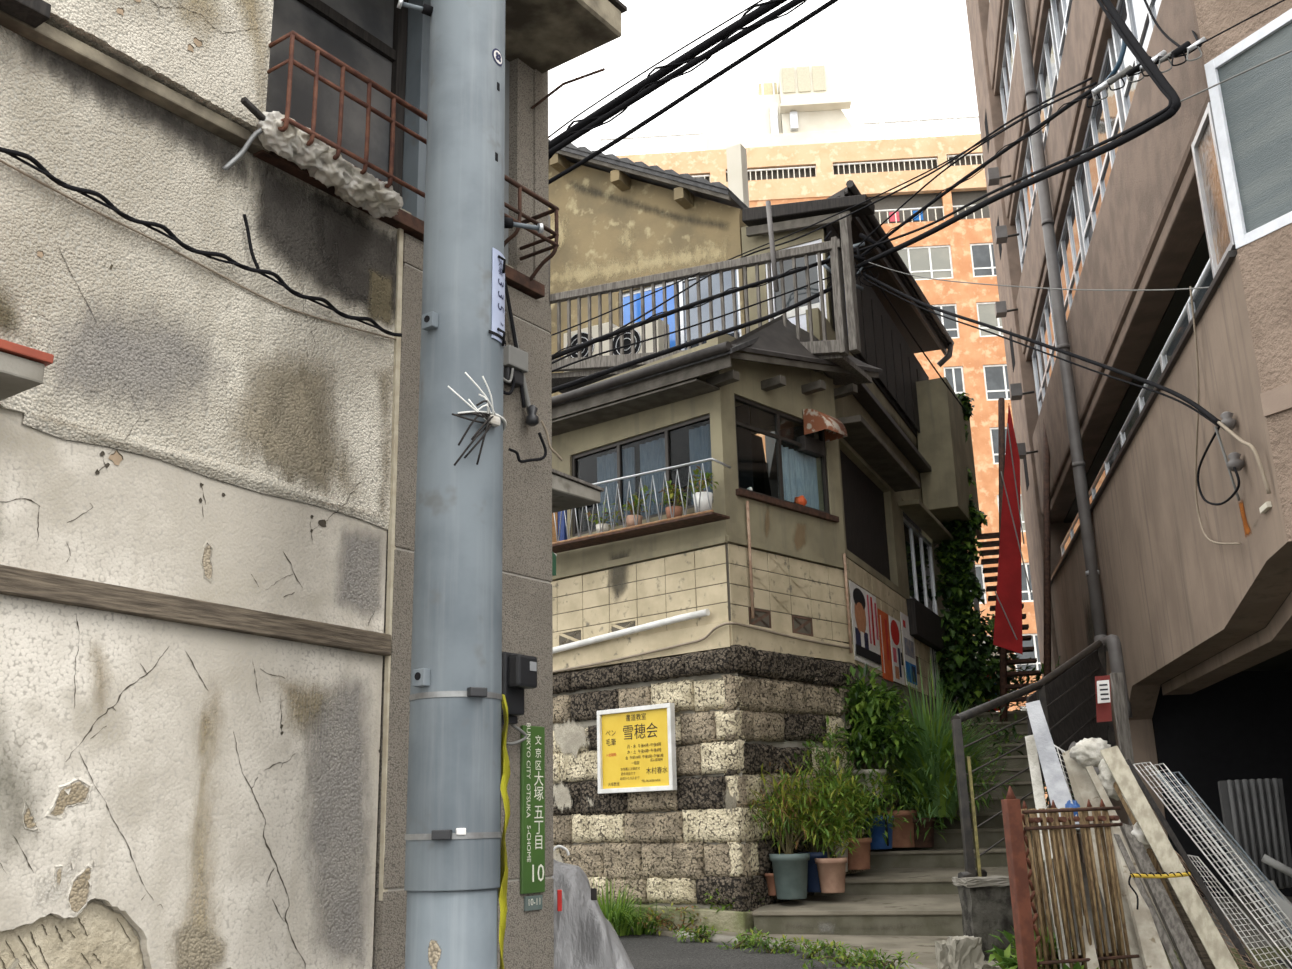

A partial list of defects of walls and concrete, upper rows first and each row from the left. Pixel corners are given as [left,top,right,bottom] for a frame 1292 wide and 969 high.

water stain [19,34,397,324]
flaking render [201,540,214,584]
flaking render [22,777,93,832]
flaking render [0,857,143,969]
crack [69,616,208,908]
water stain [179,846,225,969]
crack [234,665,306,966]
water stain [289,685,365,959]